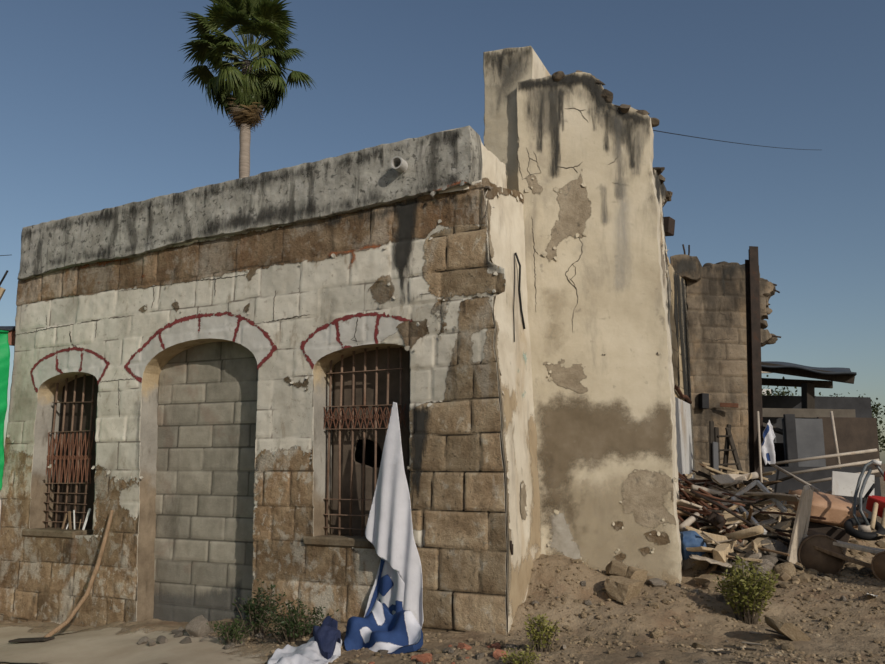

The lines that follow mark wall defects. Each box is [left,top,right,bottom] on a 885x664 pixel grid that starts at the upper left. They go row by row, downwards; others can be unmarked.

leakage [486,48,647,176]
leakage [434,130,457,187]
leakage [79,209,114,223]
leakage [204,201,340,234]
leakage [359,195,417,301]
spalling [541,173,592,261]
crack [565,237,583,330]
flaking render [0,175,543,635]
spalling [543,359,588,394]
flaking render [547,509,585,562]
leakage [509,398,673,618]
spalling [612,469,678,556]